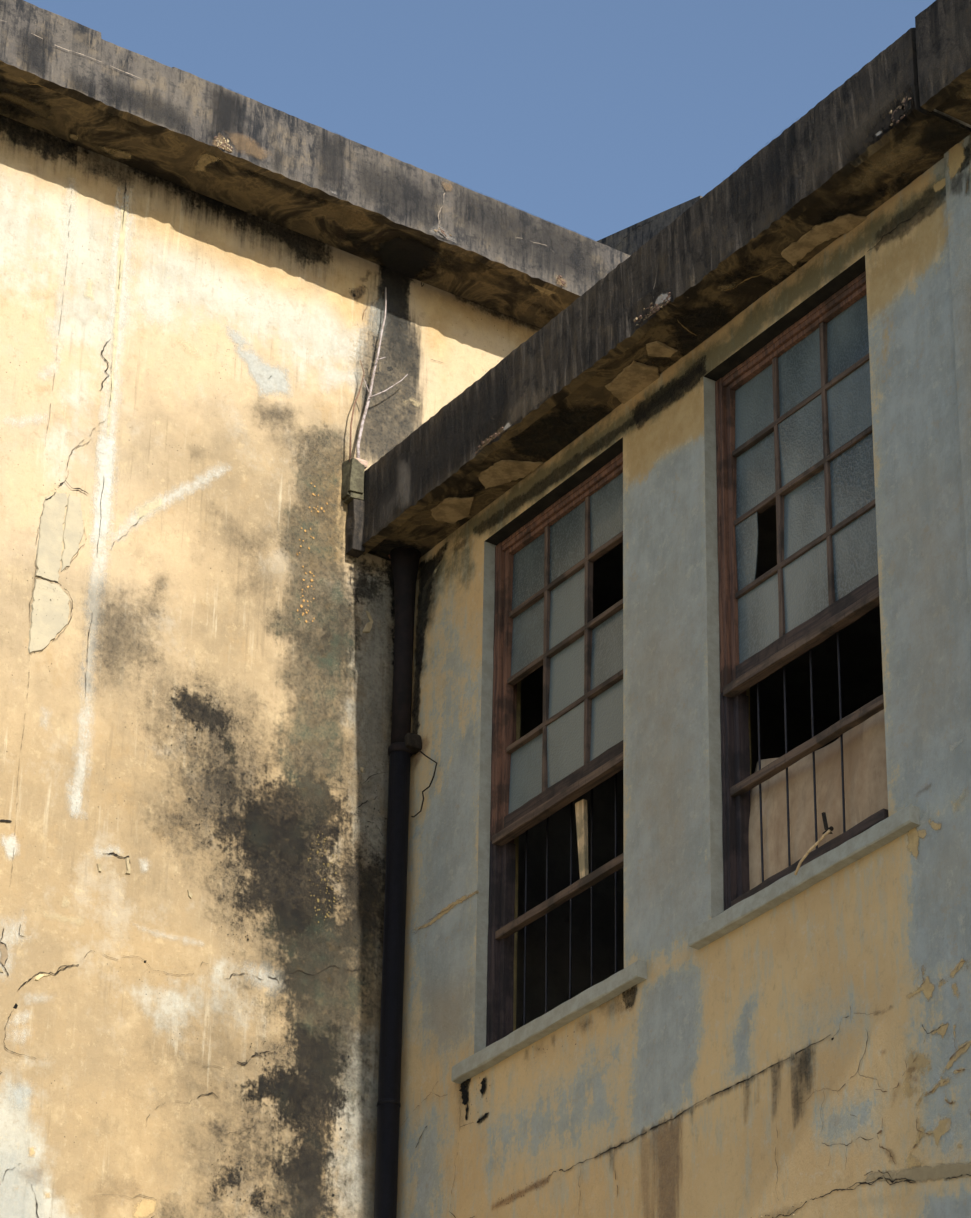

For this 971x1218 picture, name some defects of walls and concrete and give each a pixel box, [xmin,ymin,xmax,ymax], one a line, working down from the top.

damp [0,77,329,263]
damp [346,236,488,459]
damp [431,108,970,534]
peeling [28,439,91,654]
damp [368,539,432,561]
crack [0,819,16,857]
damp [168,686,384,1218]
crack [3,1147,50,1218]
crack [95,1194,157,1218]
damp [459,1071,489,1123]
crack [450,1007,917,1218]
peeling [904,1023,971,1167]